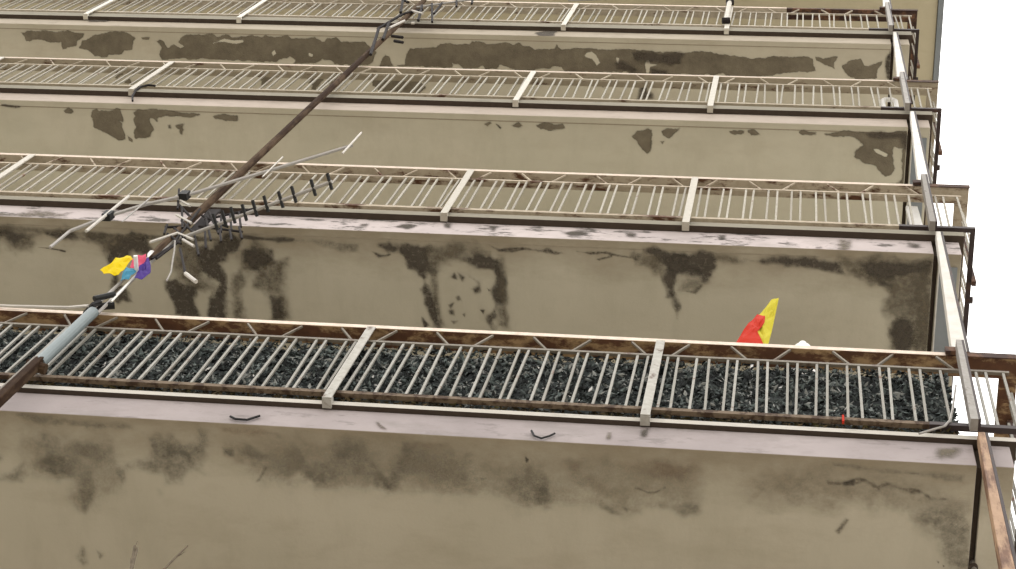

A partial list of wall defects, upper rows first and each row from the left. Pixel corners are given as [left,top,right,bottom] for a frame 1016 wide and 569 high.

spalling [22,30,882,79]
spalling [372,80,425,93]
spalling [91,108,200,142]
spalling [632,128,678,153]
spalling [799,130,907,184]
leakage [165,234,293,319]
leakage [375,244,515,328]
leakage [633,247,737,312]
leakage [760,240,932,351]
crack [836,467,883,489]